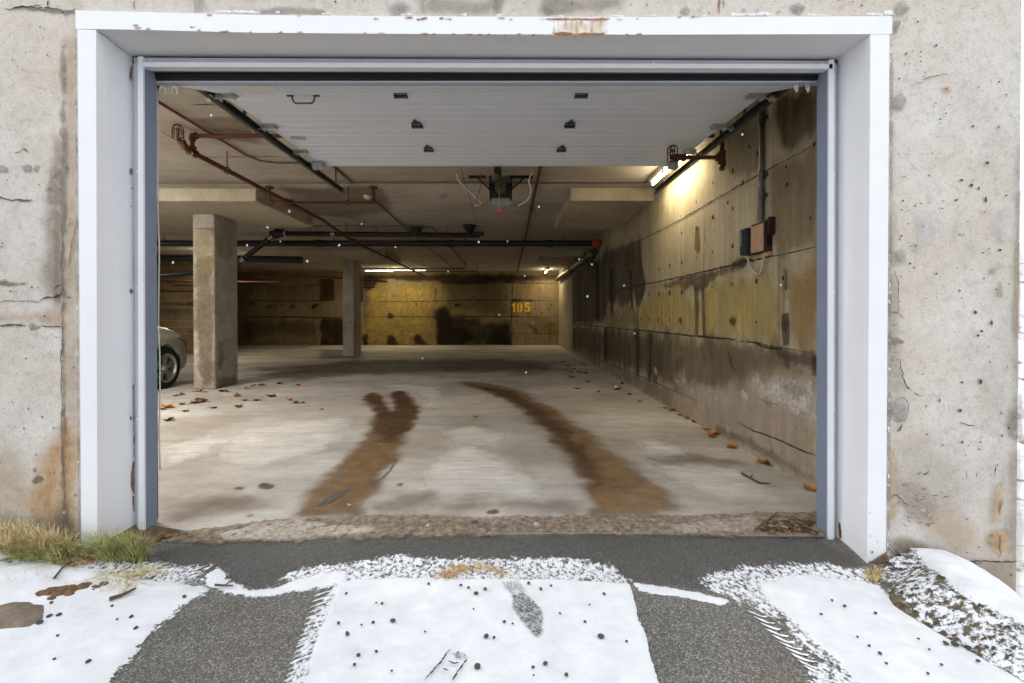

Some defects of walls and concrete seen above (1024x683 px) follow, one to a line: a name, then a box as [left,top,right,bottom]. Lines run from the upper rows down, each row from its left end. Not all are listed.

crack [4,1,74,15]
rust [547,18,609,36]
leakage [362,274,555,345]
crack [0,230,76,536]
leakage [572,241,817,471]
crack [894,361,927,432]